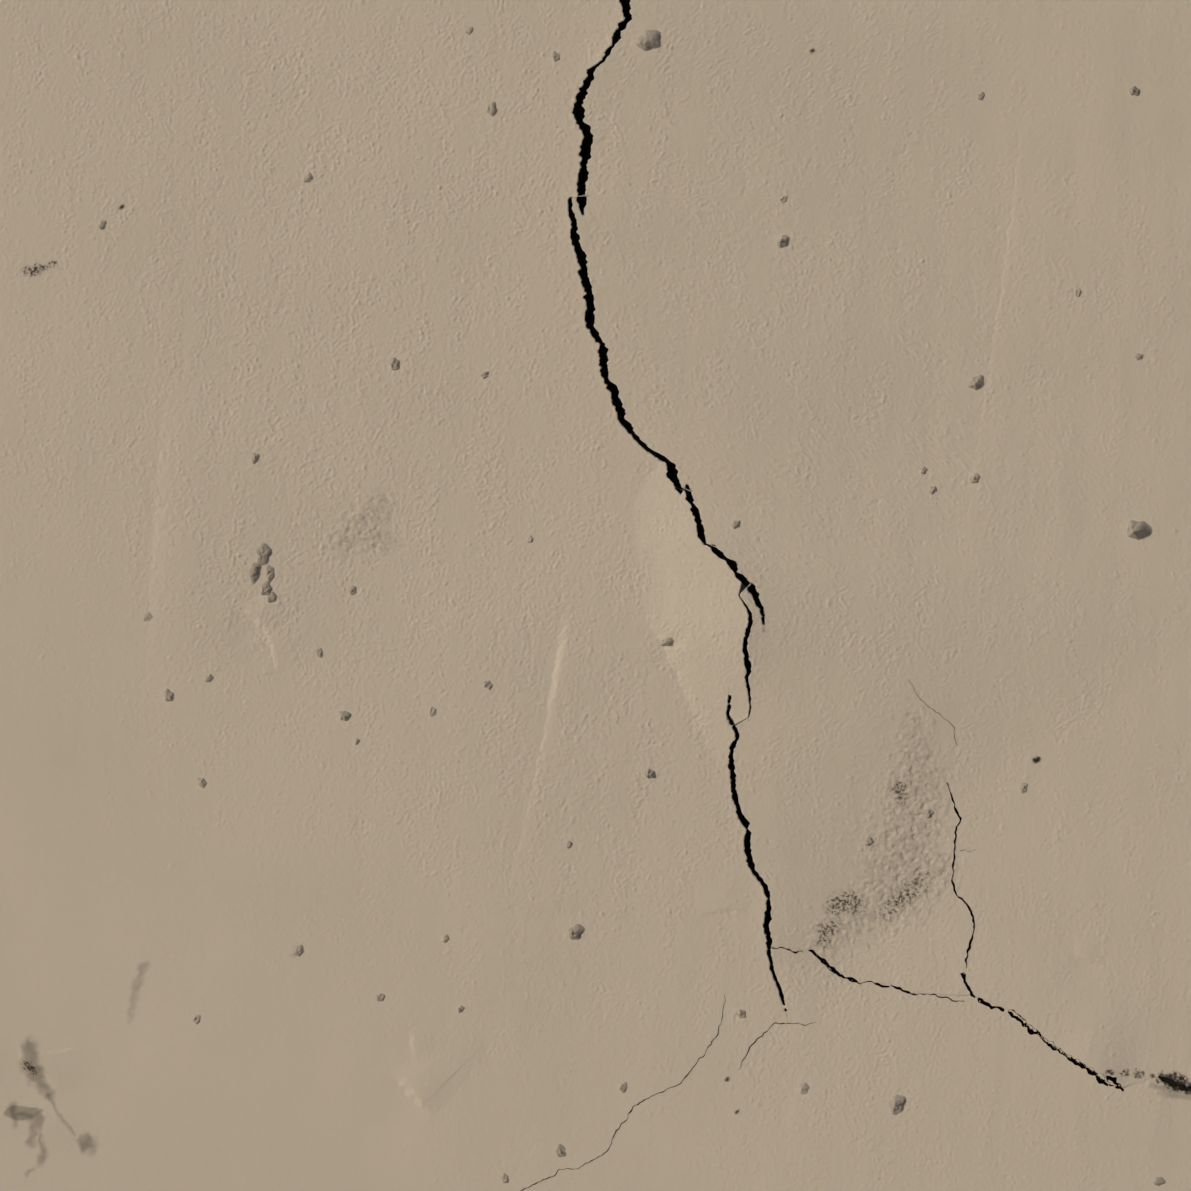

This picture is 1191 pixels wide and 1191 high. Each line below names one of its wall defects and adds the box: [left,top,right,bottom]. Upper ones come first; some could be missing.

crack [568,0,1124,1091]
crack [521,994,726,1191]